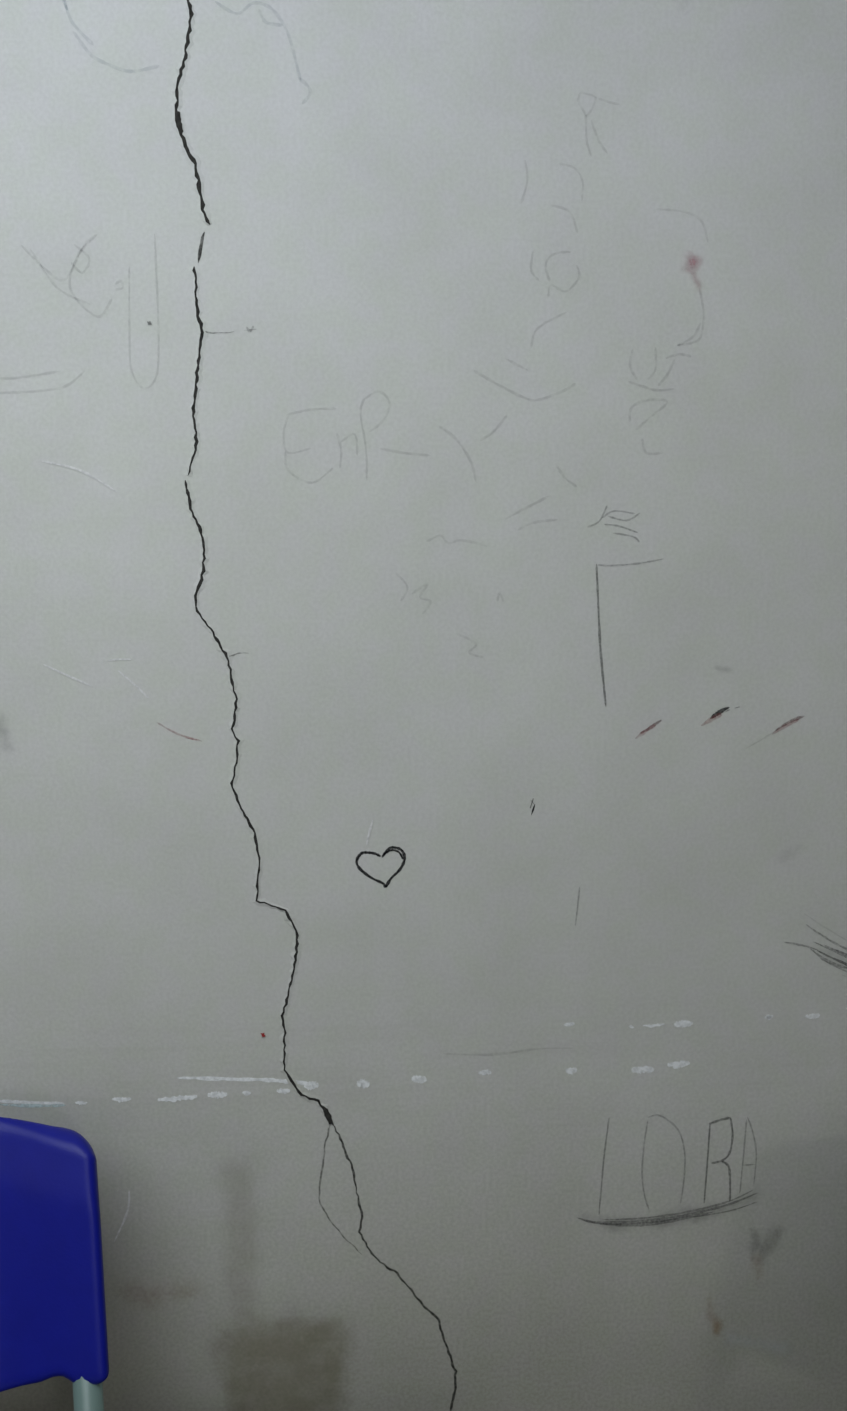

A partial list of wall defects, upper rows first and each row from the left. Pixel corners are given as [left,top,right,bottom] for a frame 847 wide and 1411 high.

crack [170,0,457,1410]